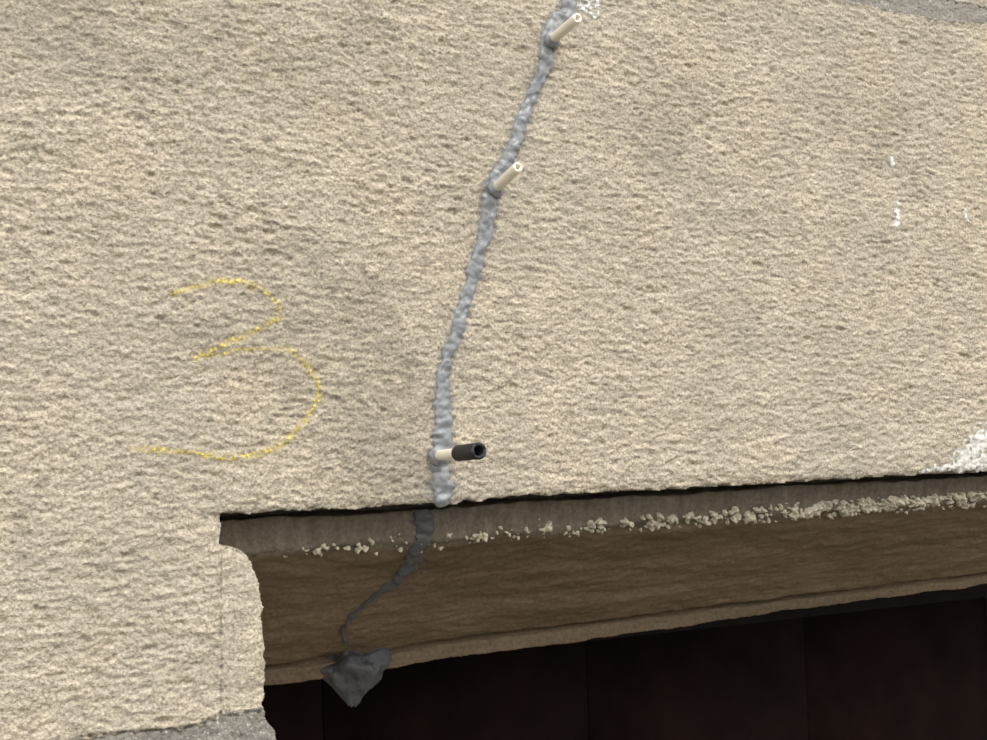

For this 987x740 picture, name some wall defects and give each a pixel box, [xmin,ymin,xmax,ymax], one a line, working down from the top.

crack [340,0,600,645]
leakage [921,422,987,473]